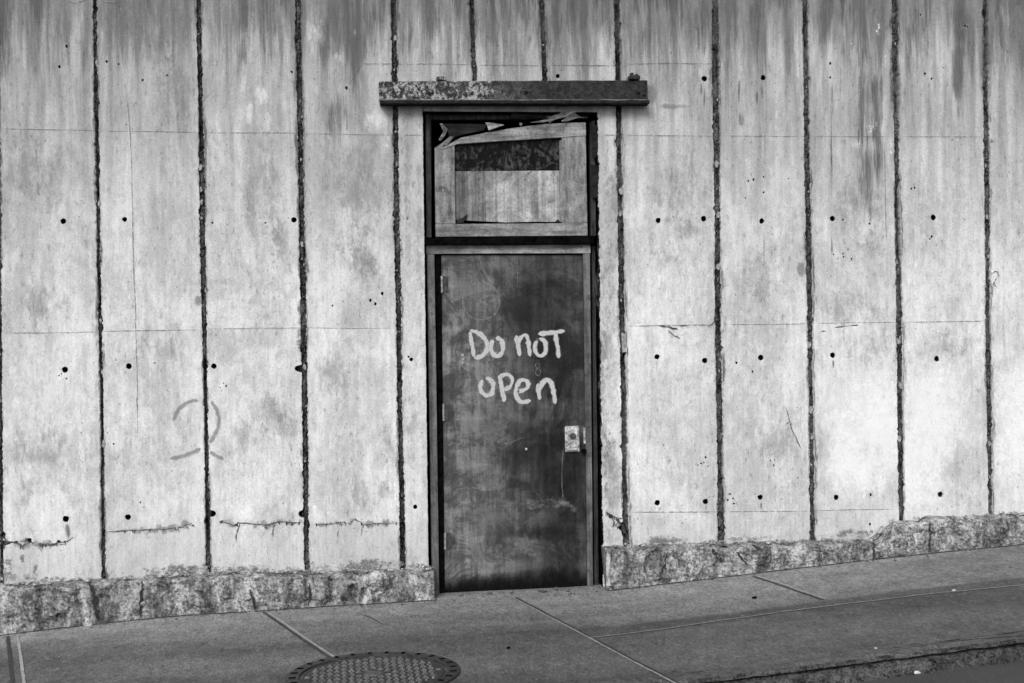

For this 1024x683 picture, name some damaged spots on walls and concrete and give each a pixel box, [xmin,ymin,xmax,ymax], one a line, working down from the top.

damp [952,55,962,94]
damp [841,0,882,198]
crack [109,523,195,533]
crack [220,519,397,540]
crack [1,532,73,549]